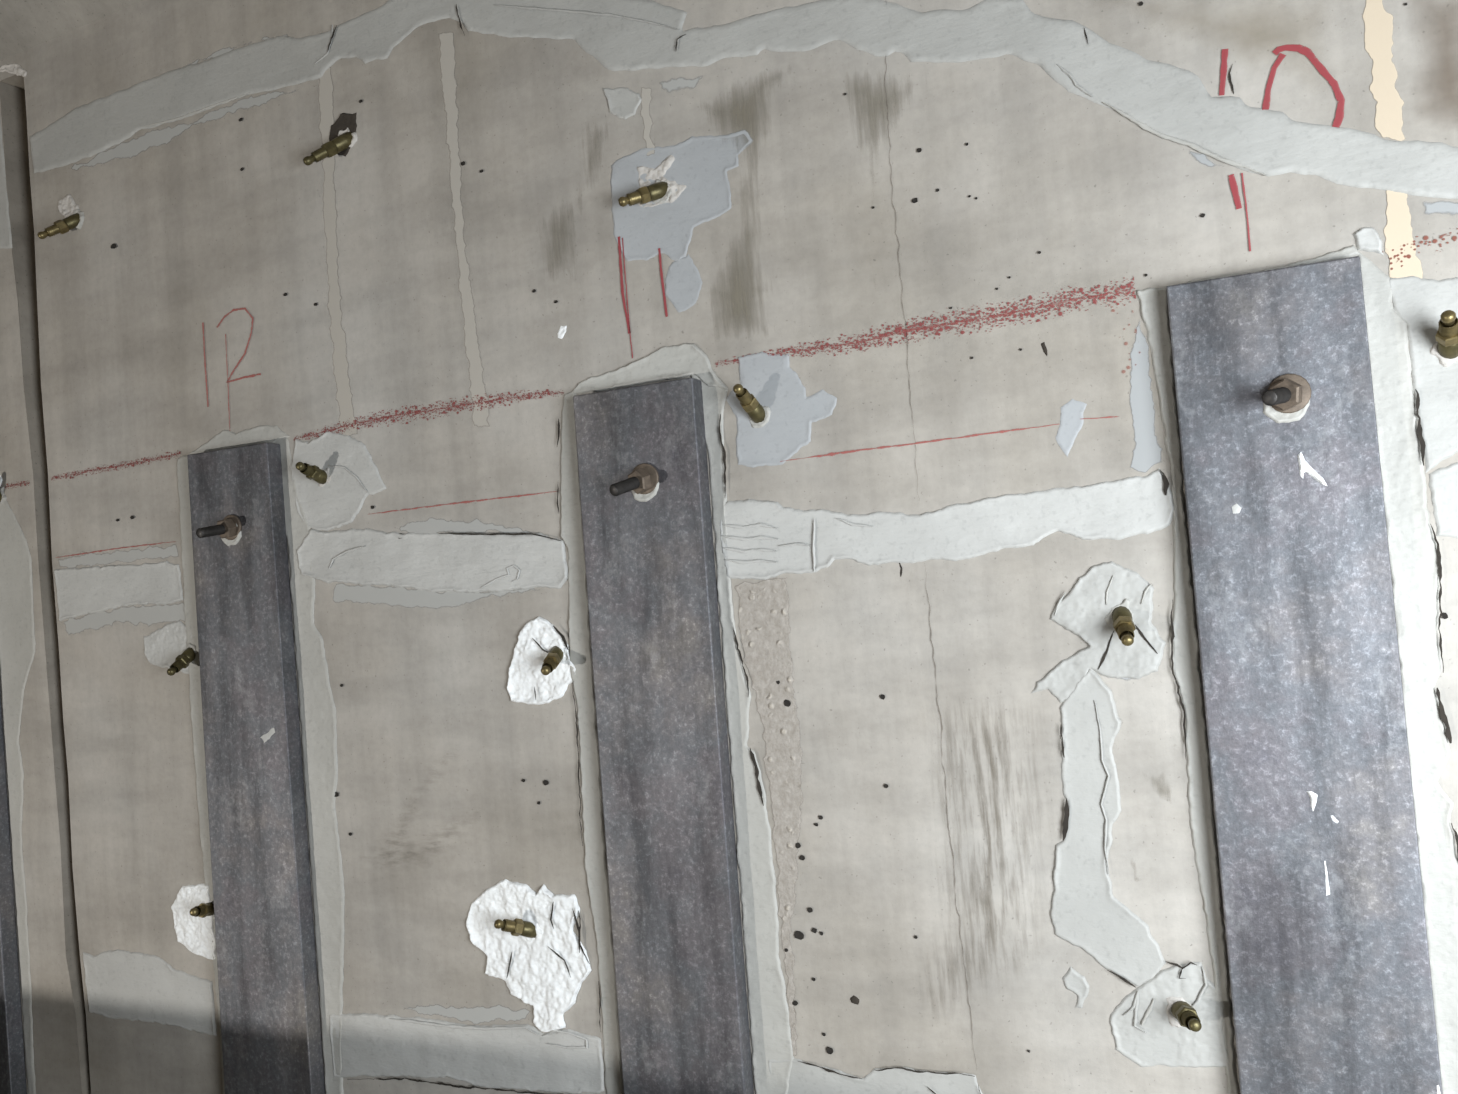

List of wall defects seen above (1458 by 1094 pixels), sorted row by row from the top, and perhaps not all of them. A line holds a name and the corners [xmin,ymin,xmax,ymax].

spalling [0,63,27,77]
spalling [329,112,357,156]
spalling [58,194,79,218]
spalling [637,155,686,208]
crack [1415,389,1426,466]
crack [1430,524,1452,743]
spalling [735,578,803,1056]
crack [1450,823,1458,855]